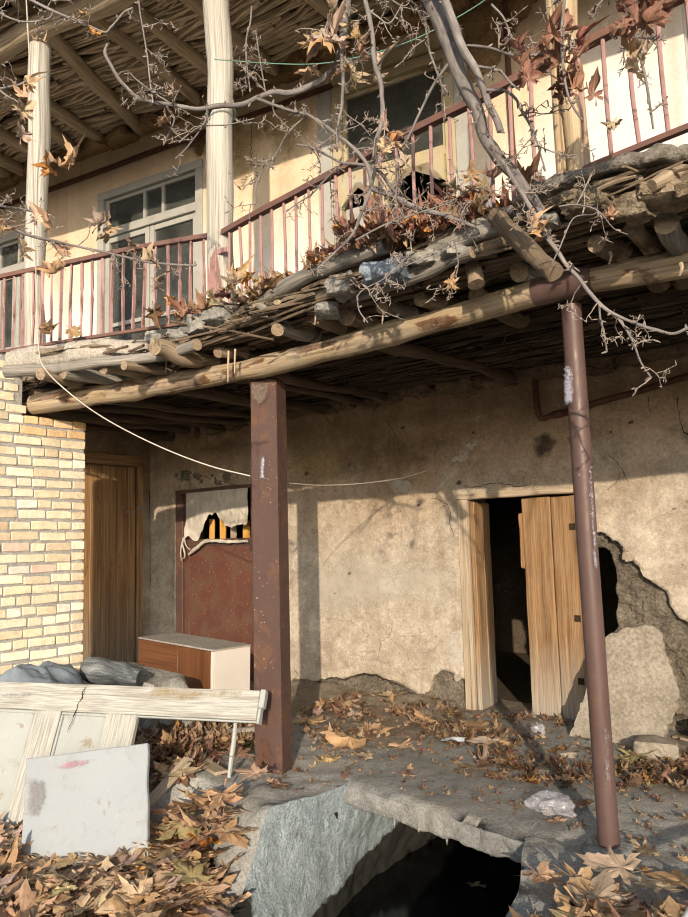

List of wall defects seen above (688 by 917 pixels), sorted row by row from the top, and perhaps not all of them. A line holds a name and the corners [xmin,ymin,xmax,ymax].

flaking render [319,670,466,707]
flaking render [597,526,688,734]